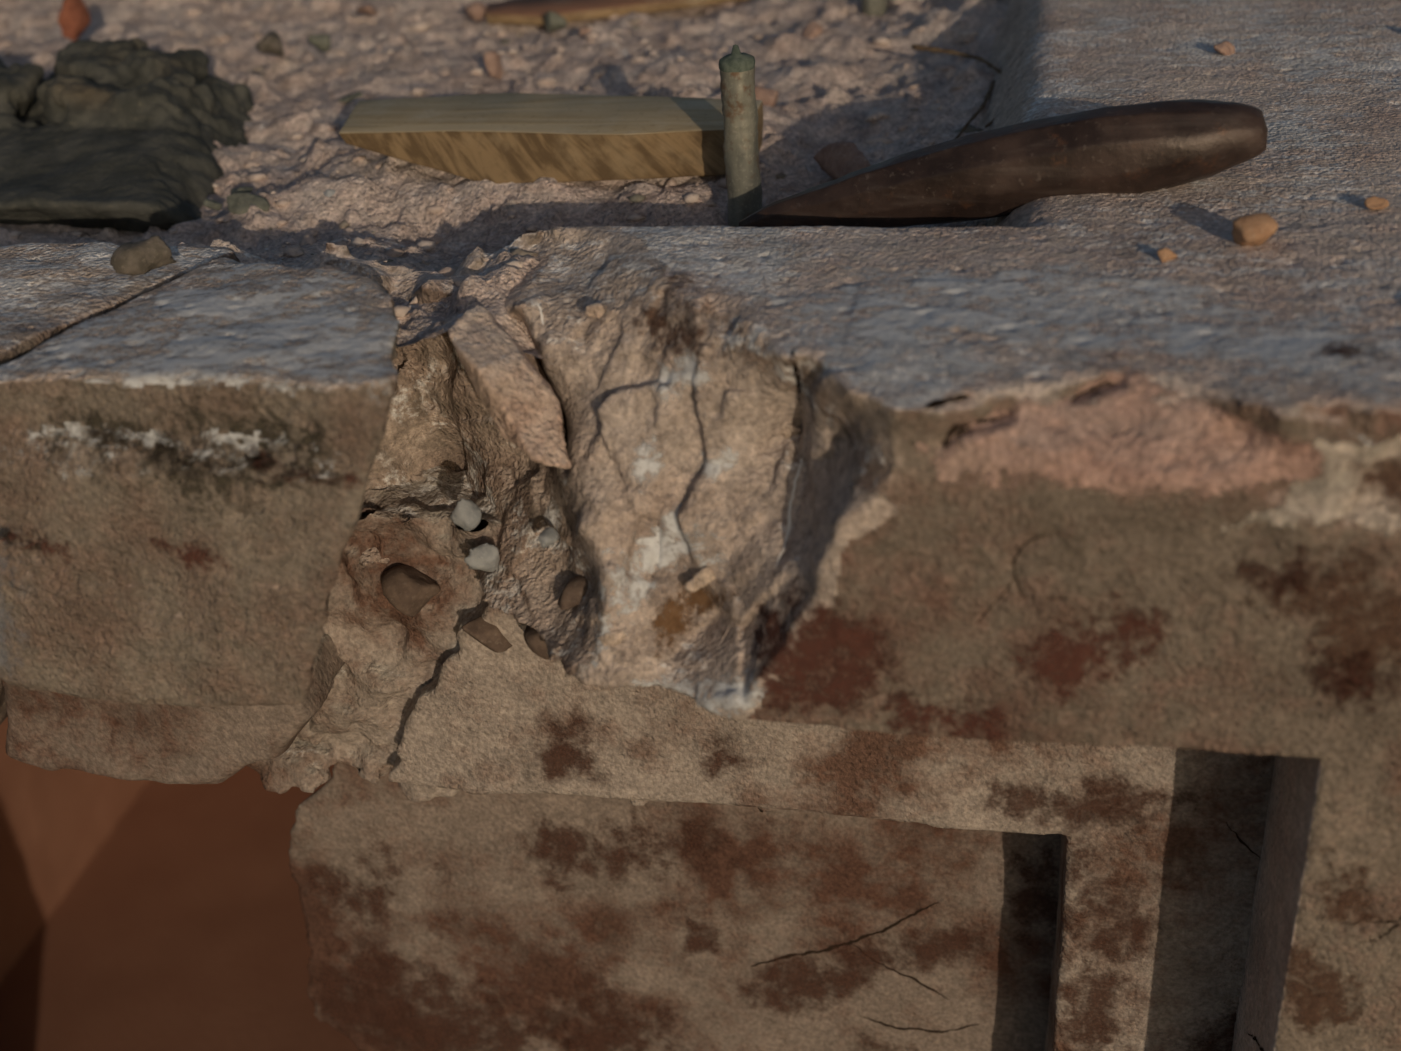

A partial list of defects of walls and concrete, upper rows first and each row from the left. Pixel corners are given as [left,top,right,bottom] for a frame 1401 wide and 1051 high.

spalling [448,226,907,720]
corrosion [751,583,1007,741]
corrosion [1011,593,1167,705]
leakage [543,717,594,780]
leakage [989,776,1193,828]
leakage [312,938,676,1051]
leakage [740,927,984,1012]
crack [751,902,979,1033]
leakage [1012,849,1150,1051]
corrosion [1284,948,1363,1035]
corrosion [1323,864,1376,925]
crack [1340,917,1401,943]